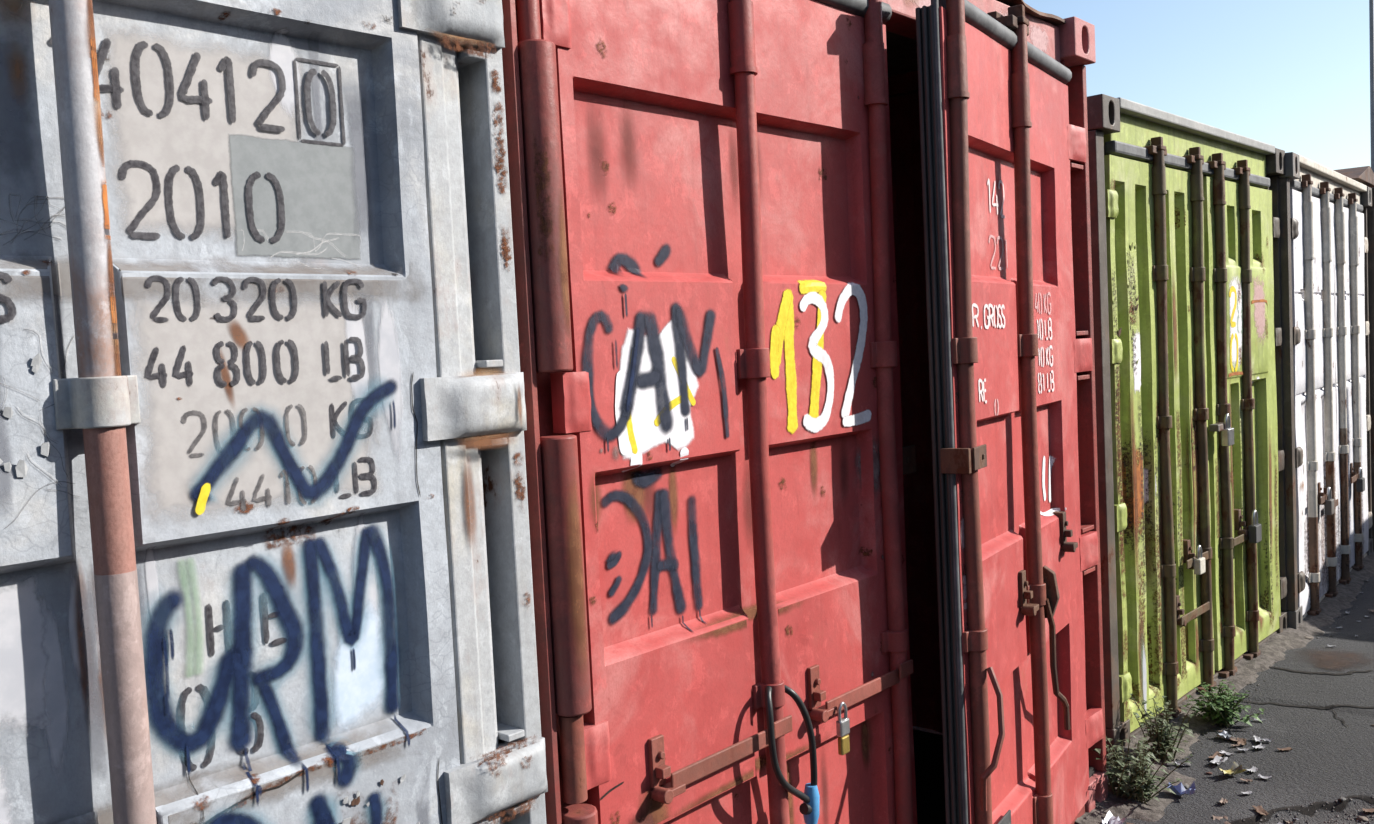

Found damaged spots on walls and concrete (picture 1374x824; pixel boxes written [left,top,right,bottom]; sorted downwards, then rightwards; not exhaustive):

corrosion [442,34,506,193]
corrosion [501,229,511,268]
corrosion [467,433,525,500]
crack [1239,666,1374,727]
corrosion [479,738,534,775]
corrosion [488,799,535,824]
crack [1229,795,1374,824]